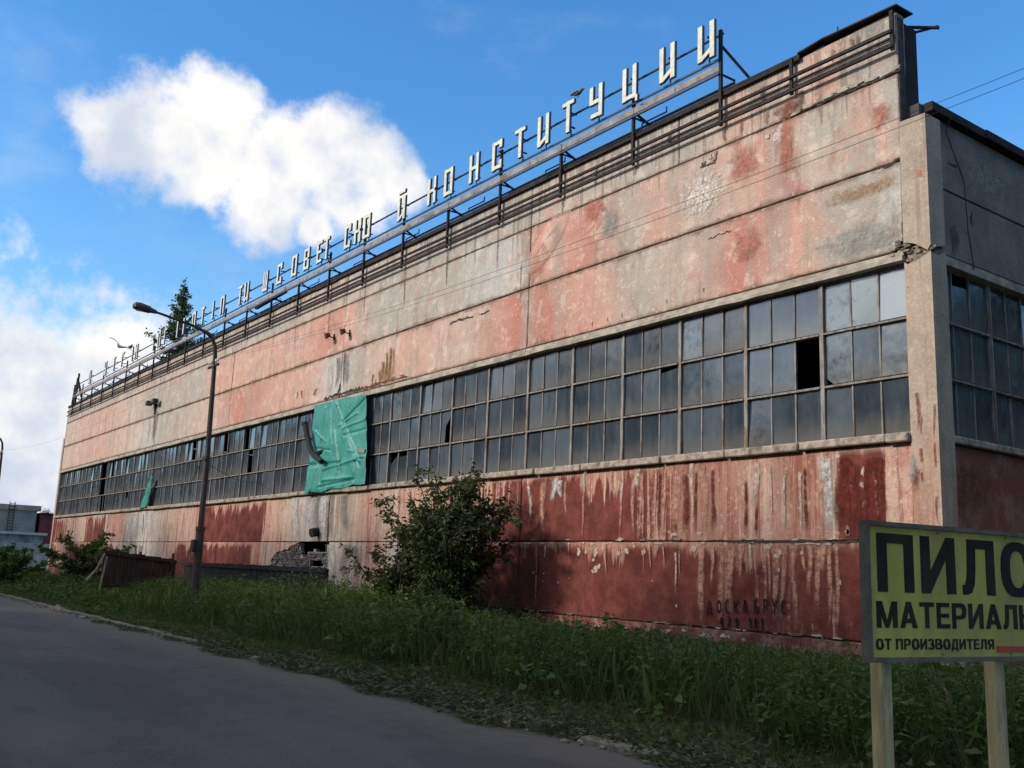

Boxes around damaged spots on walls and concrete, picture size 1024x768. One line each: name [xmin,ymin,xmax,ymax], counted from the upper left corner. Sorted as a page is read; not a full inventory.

spalling [890,238,938,263]
corrosion [347,348,405,394]
damp [528,479,566,525]
damp [610,463,716,528]
damp [744,463,807,530]
damp [818,457,886,526]
flaking render [271,544,329,569]
peeling [527,533,680,573]
damp [643,545,680,584]
damp [698,543,752,614]
spalling [724,525,859,572]
damp [768,544,840,624]